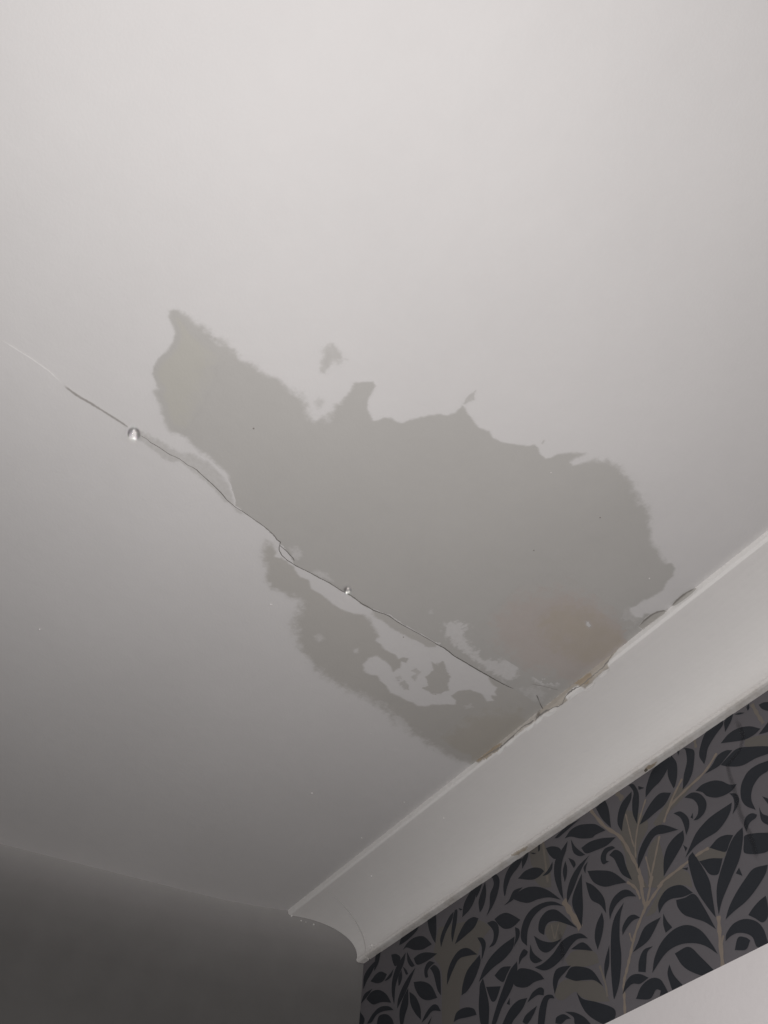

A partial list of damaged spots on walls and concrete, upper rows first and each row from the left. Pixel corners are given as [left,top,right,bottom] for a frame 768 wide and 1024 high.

crack [0,338,557,709]
water stain [135,305,678,766]